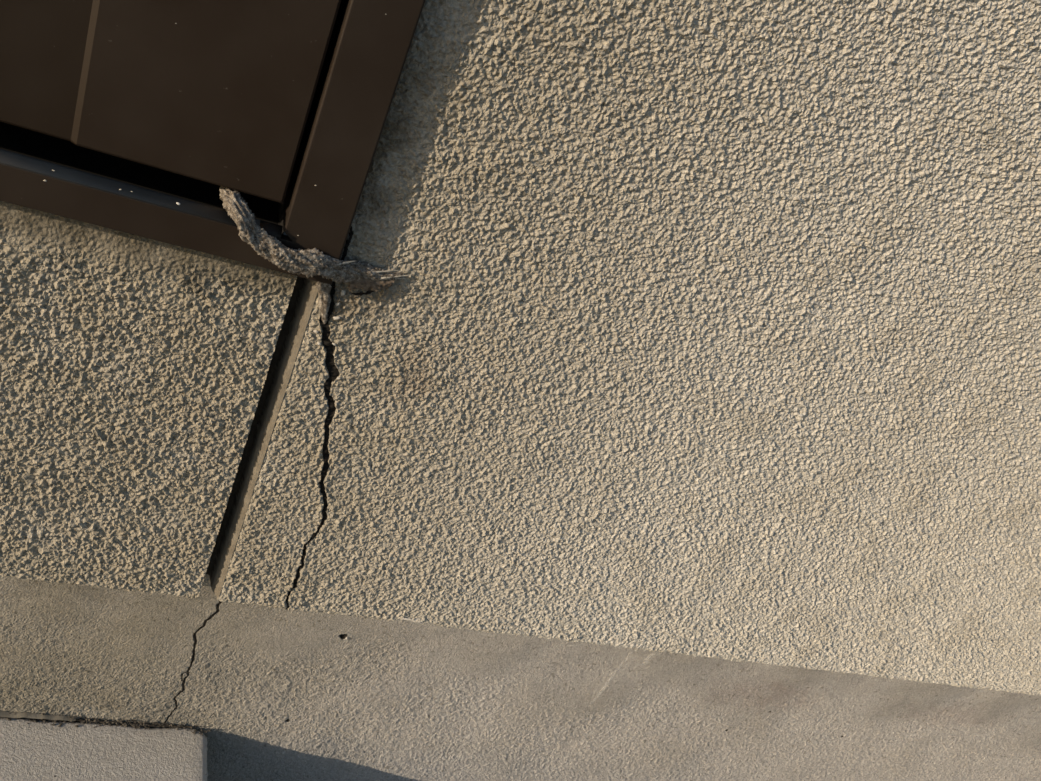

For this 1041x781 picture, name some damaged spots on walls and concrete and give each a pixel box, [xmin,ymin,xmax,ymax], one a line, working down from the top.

crack [285,226,375,610]
crack [47,601,221,727]